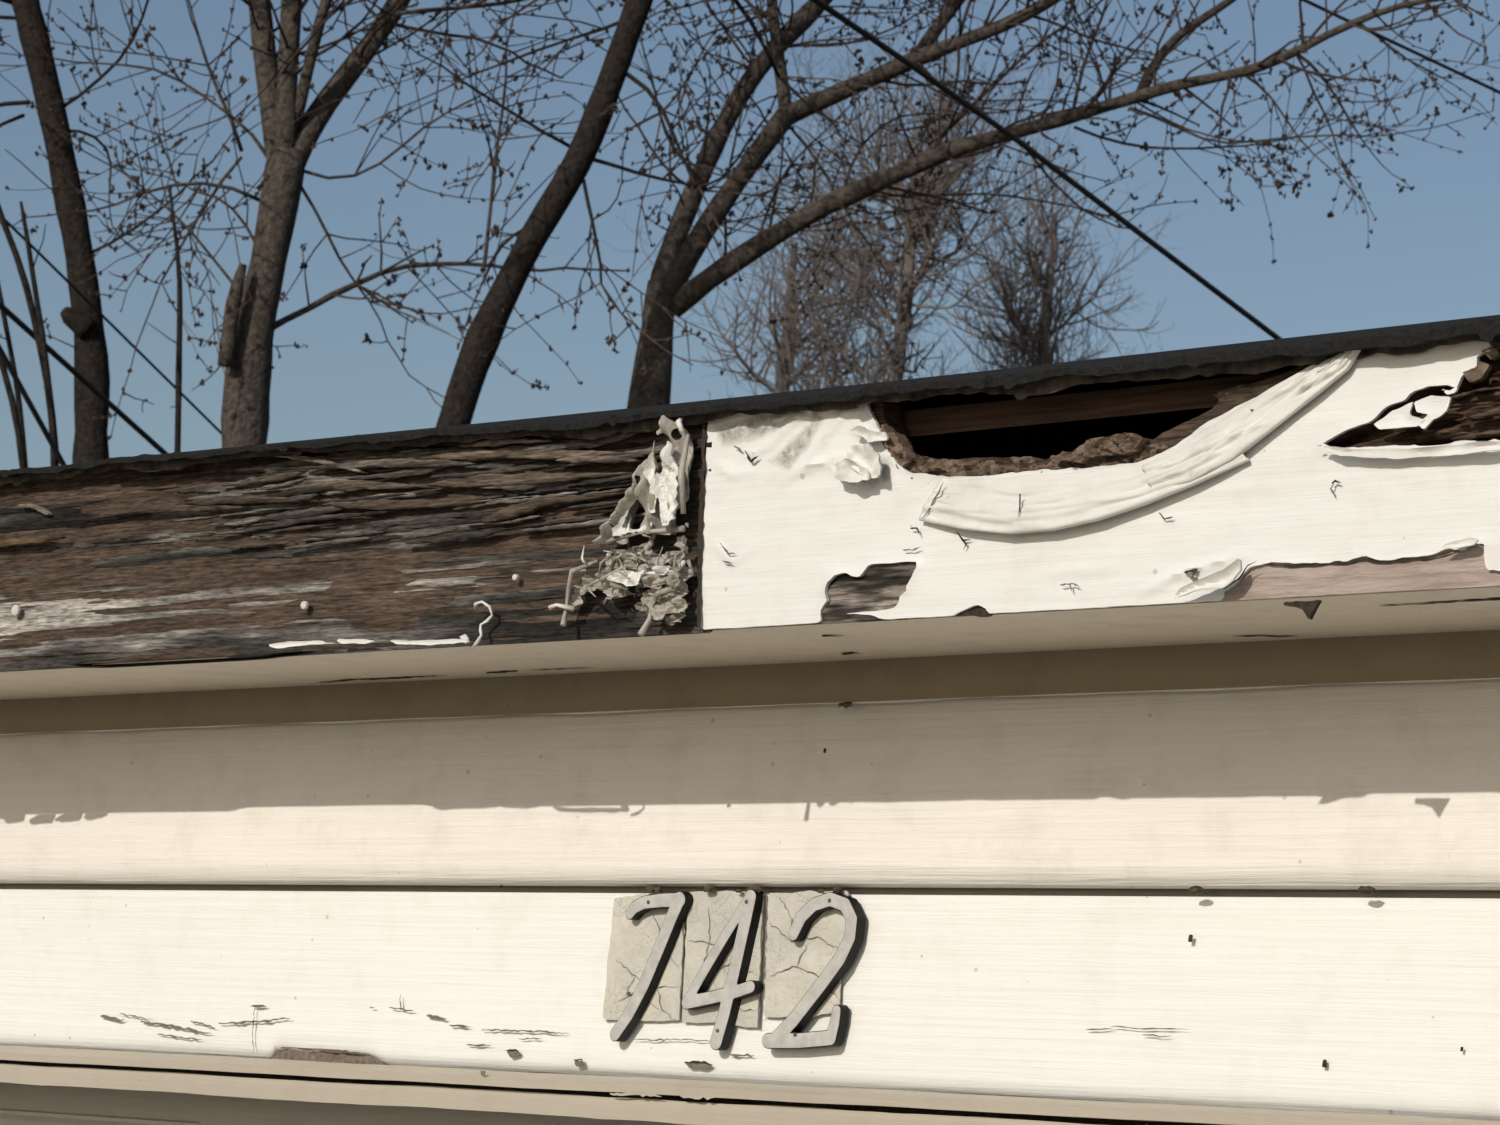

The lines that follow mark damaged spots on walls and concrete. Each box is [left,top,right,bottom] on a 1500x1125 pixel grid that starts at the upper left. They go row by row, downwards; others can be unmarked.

peeling [1374,386,1459,430]
peeling [919,350,1361,550]
peeling [548,415,706,637]
peeling [269,601,494,649]
peeling [811,562,916,625]
peeling [1174,537,1500,620]